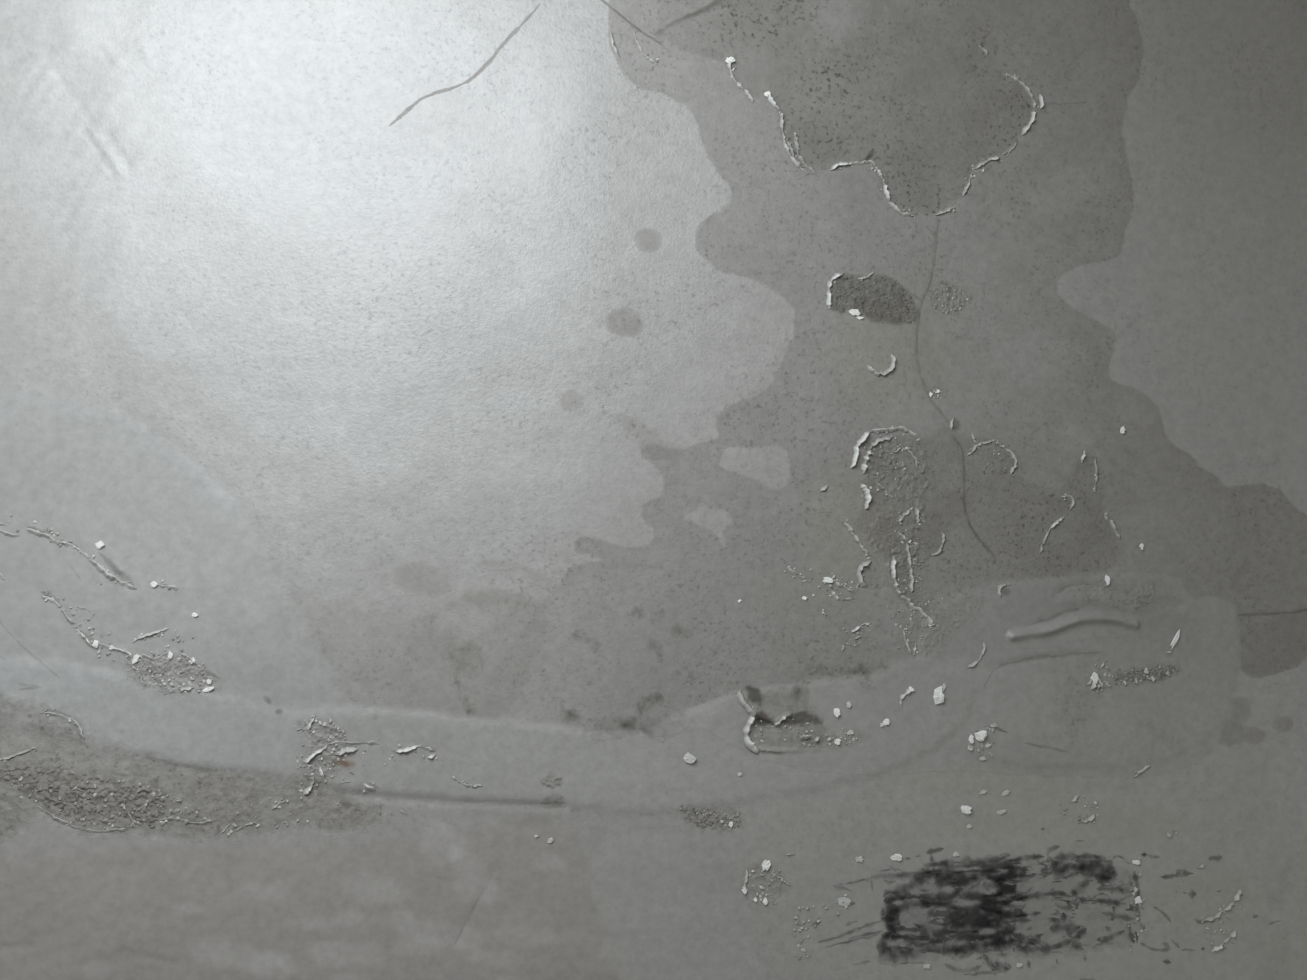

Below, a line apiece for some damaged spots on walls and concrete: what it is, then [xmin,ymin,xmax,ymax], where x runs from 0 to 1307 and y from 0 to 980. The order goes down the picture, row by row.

crack [601,0,749,65]
peeling [658,0,1045,218]
flaking render [825,271,921,326]
water stain [286,0,1307,748]
crack [911,217,996,564]
peeling [0,514,178,591]
peeling [783,425,1144,663]
peeling [40,590,222,700]
flaking render [1084,629,1181,698]
flaking render [0,686,437,854]
flaking render [735,683,890,755]
peeling [740,853,795,907]